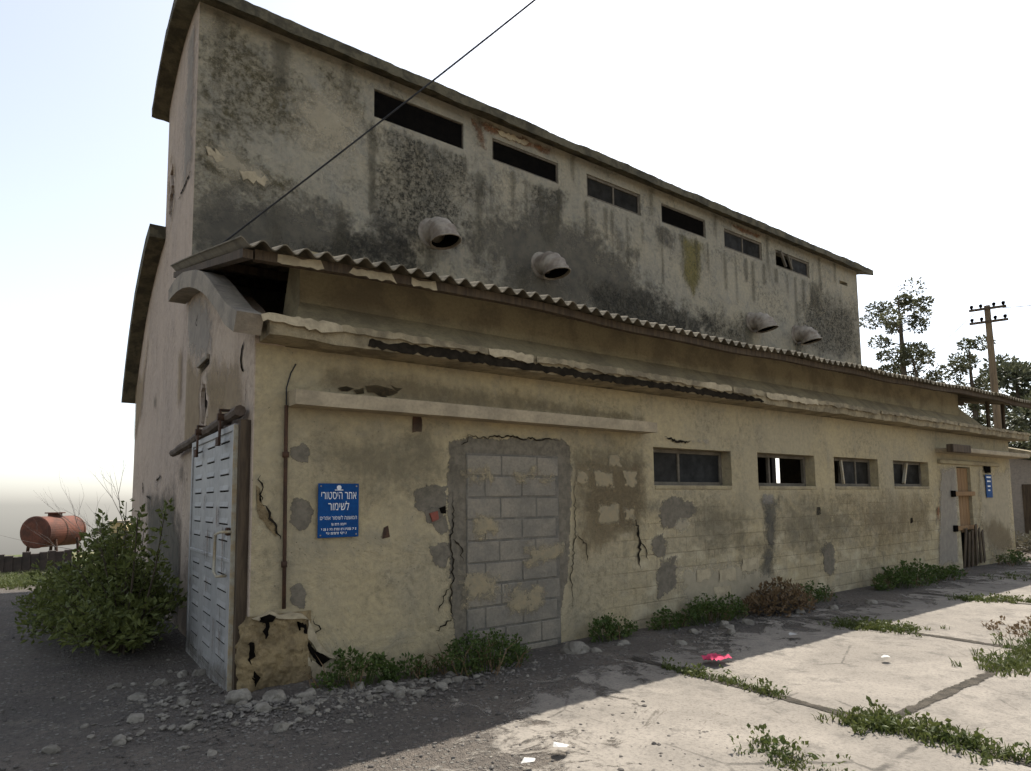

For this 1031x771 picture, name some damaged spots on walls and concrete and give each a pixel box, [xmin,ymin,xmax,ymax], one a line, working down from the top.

flaking render [168,29,269,220]
water stain [192,27,747,342]
flaking render [184,300,241,441]
flaking render [261,312,1031,436]
spalling [256,476,281,539]
spalling [425,506,446,524]
crack [635,520,648,569]
flaking render [234,610,330,692]